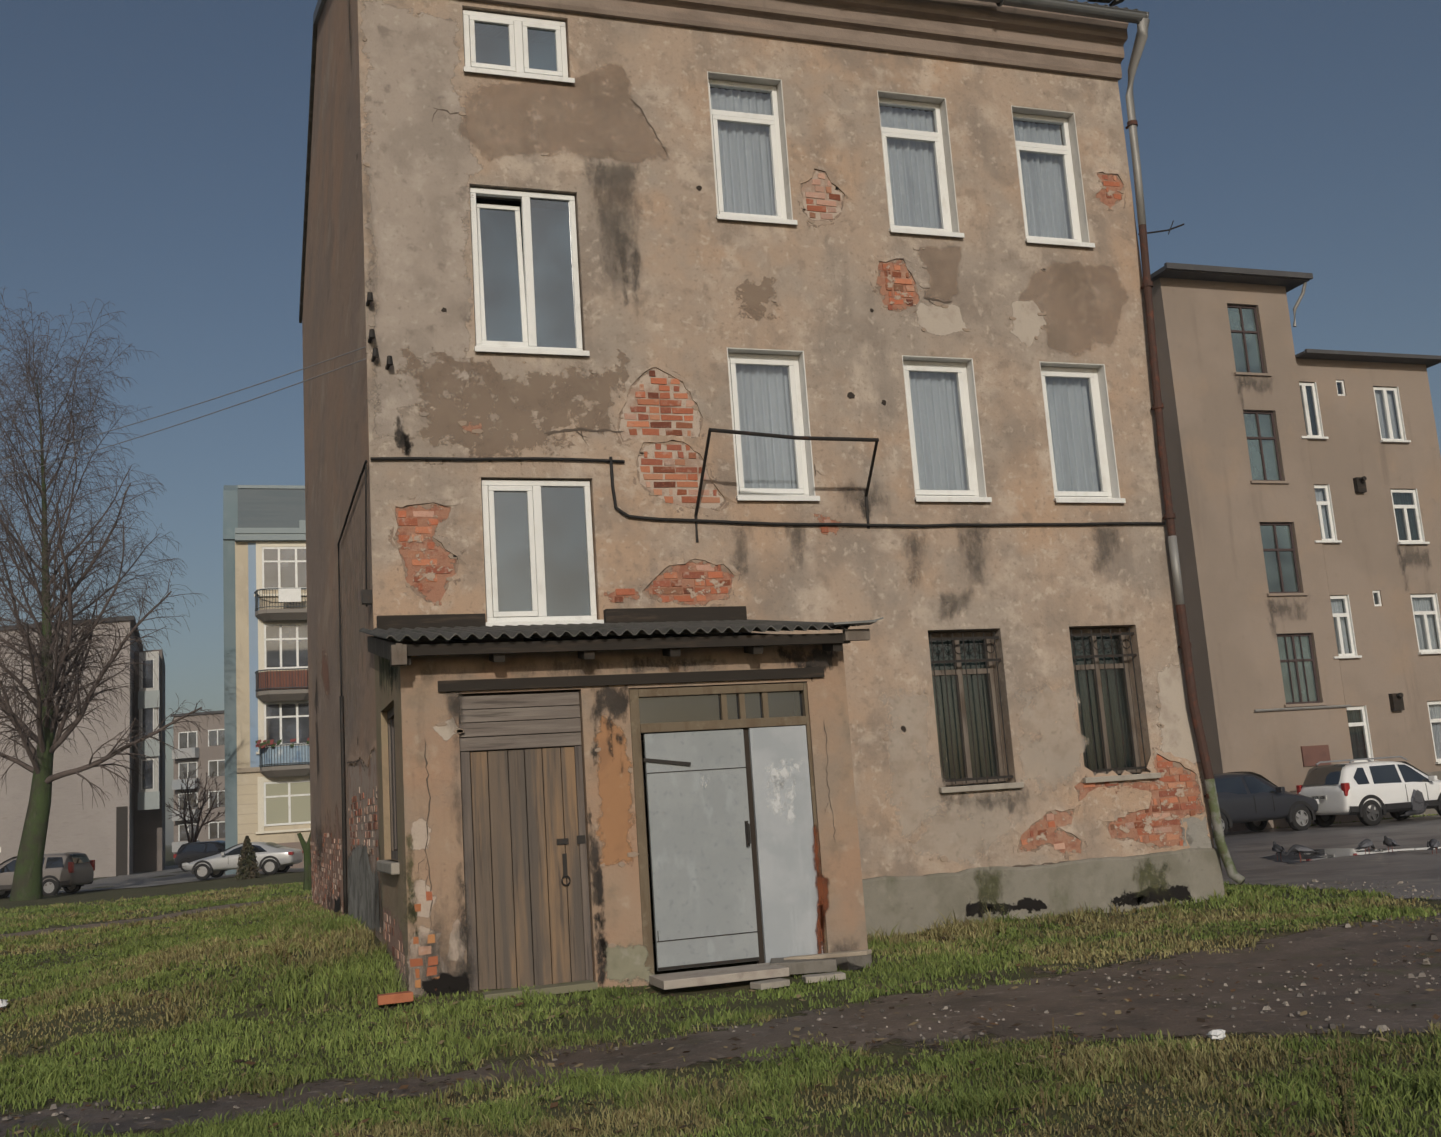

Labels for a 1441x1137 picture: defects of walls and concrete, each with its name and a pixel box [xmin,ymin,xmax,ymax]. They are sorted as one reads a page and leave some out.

peeling [360,0,738,519]
leakage [594,166,638,282]
spalling [792,160,853,231]
spalling [867,250,949,332]
spalling [1087,168,1129,213]
spalling [384,490,467,611]
spalling [604,549,743,608]
spalling [310,736,379,915]
spalling [410,817,432,850]
peeling [594,716,639,868]
spalling [1011,747,1212,864]
spalling [380,879,472,997]